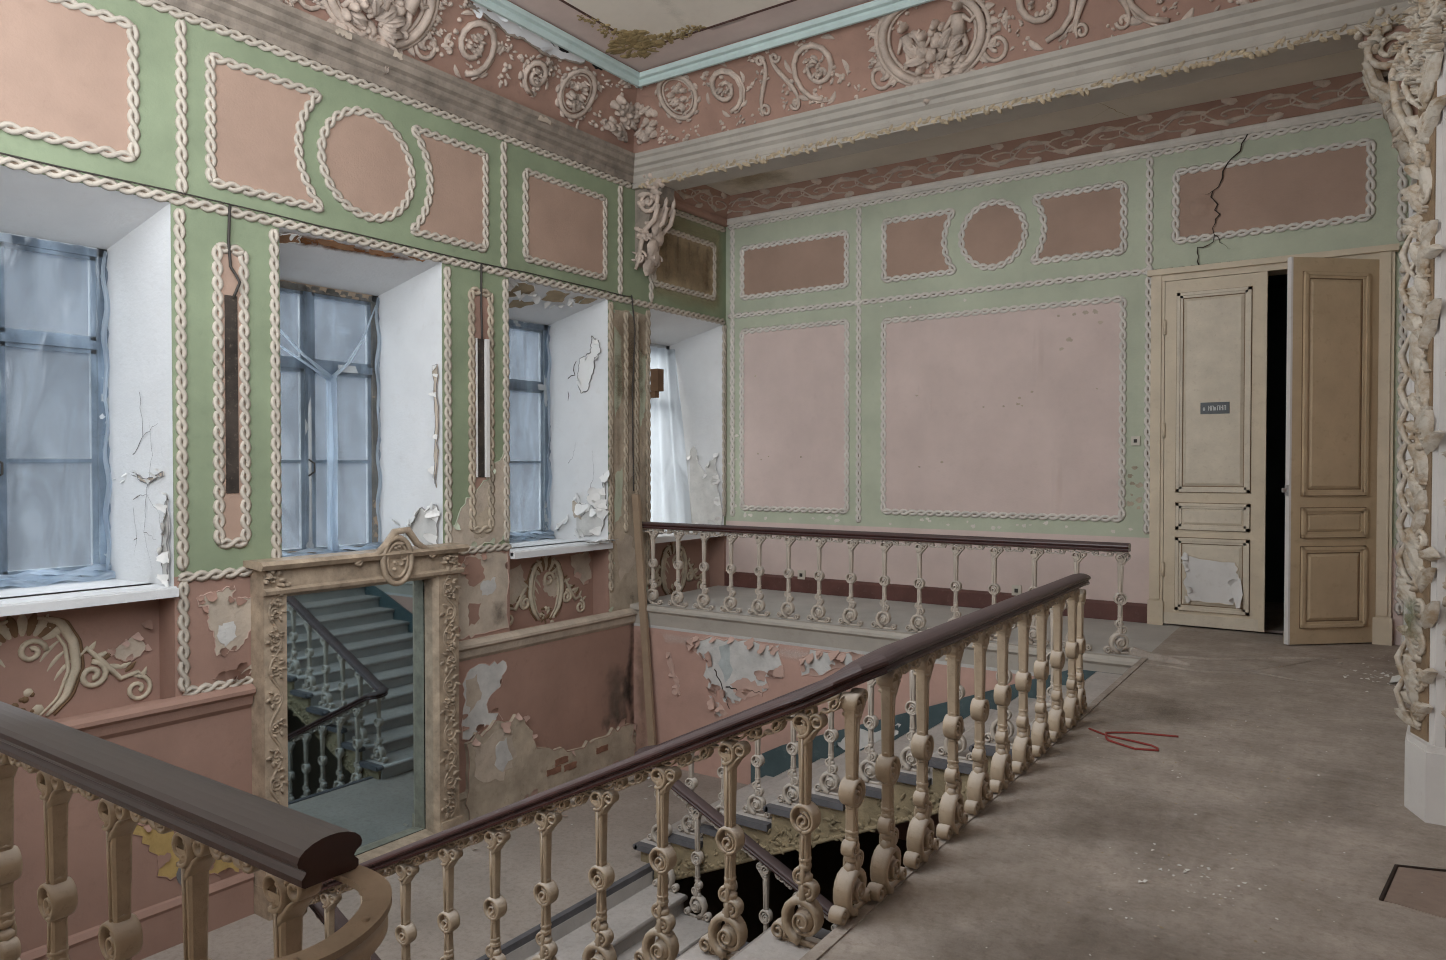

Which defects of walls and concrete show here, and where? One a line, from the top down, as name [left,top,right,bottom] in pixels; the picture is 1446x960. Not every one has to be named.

crack [1197,134,1248,265]
peeling [509,280,597,309]
crack [133,392,162,558]
peeling [392,364,441,546]
flaking render [555,309,648,612]
peeling [686,446,767,525]
peeling [196,584,252,683]
peeling [458,551,557,640]
peeling [666,636,864,720]
flaking render [461,660,637,820]
peeling [132,824,182,887]
peeling [209,859,239,879]